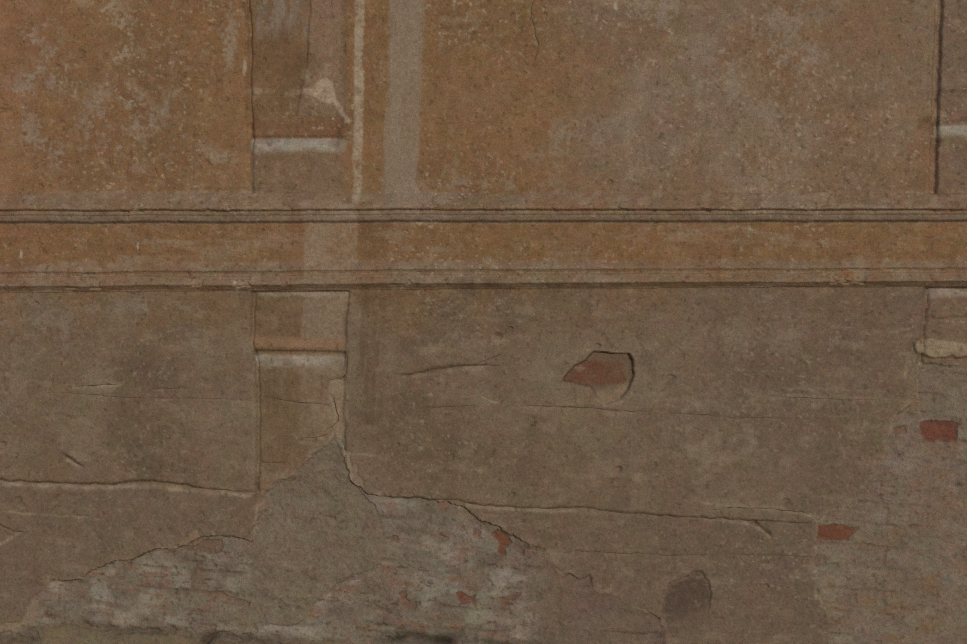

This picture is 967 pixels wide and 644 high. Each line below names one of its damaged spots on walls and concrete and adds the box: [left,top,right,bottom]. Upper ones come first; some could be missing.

crack [401,353,502,375]
spalling [561,350,615,404]
crack [0,452,252,492]
spalling [31,443,714,644]
crack [387,496,816,557]